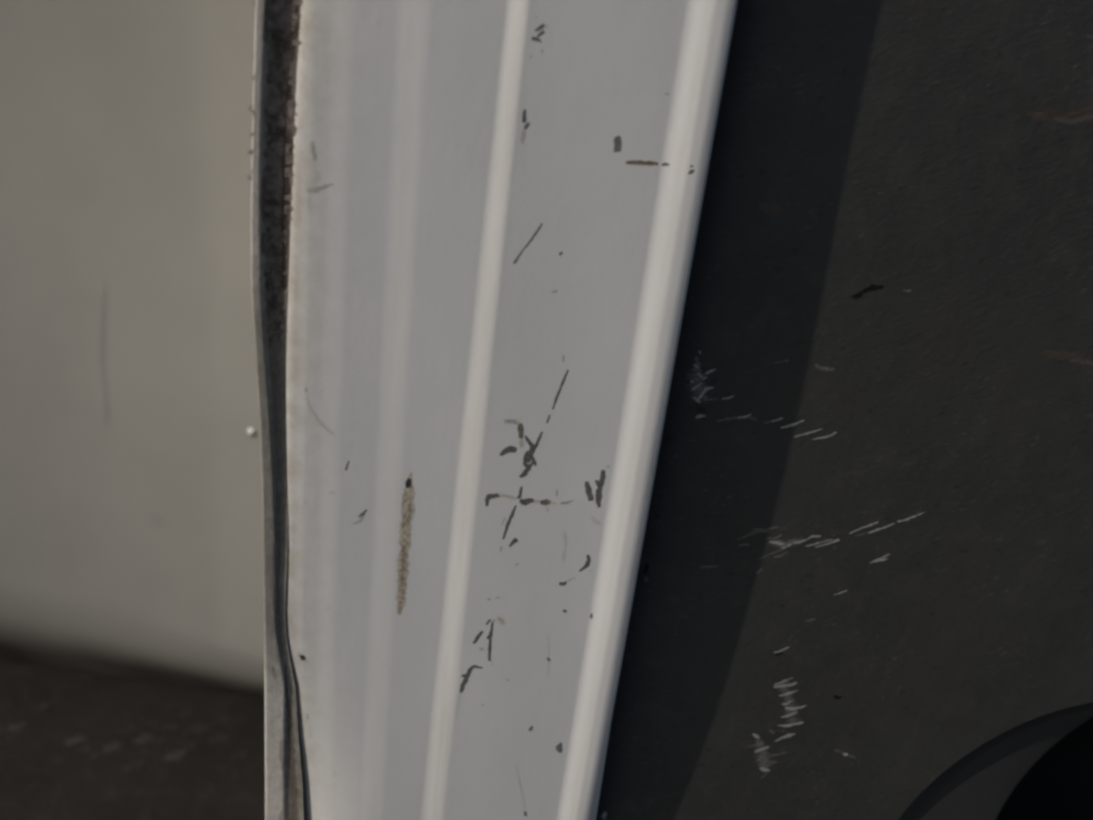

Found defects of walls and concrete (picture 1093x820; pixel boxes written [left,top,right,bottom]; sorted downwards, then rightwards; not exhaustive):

peeling [485,419,574,512]
peeling [584,466,609,508]